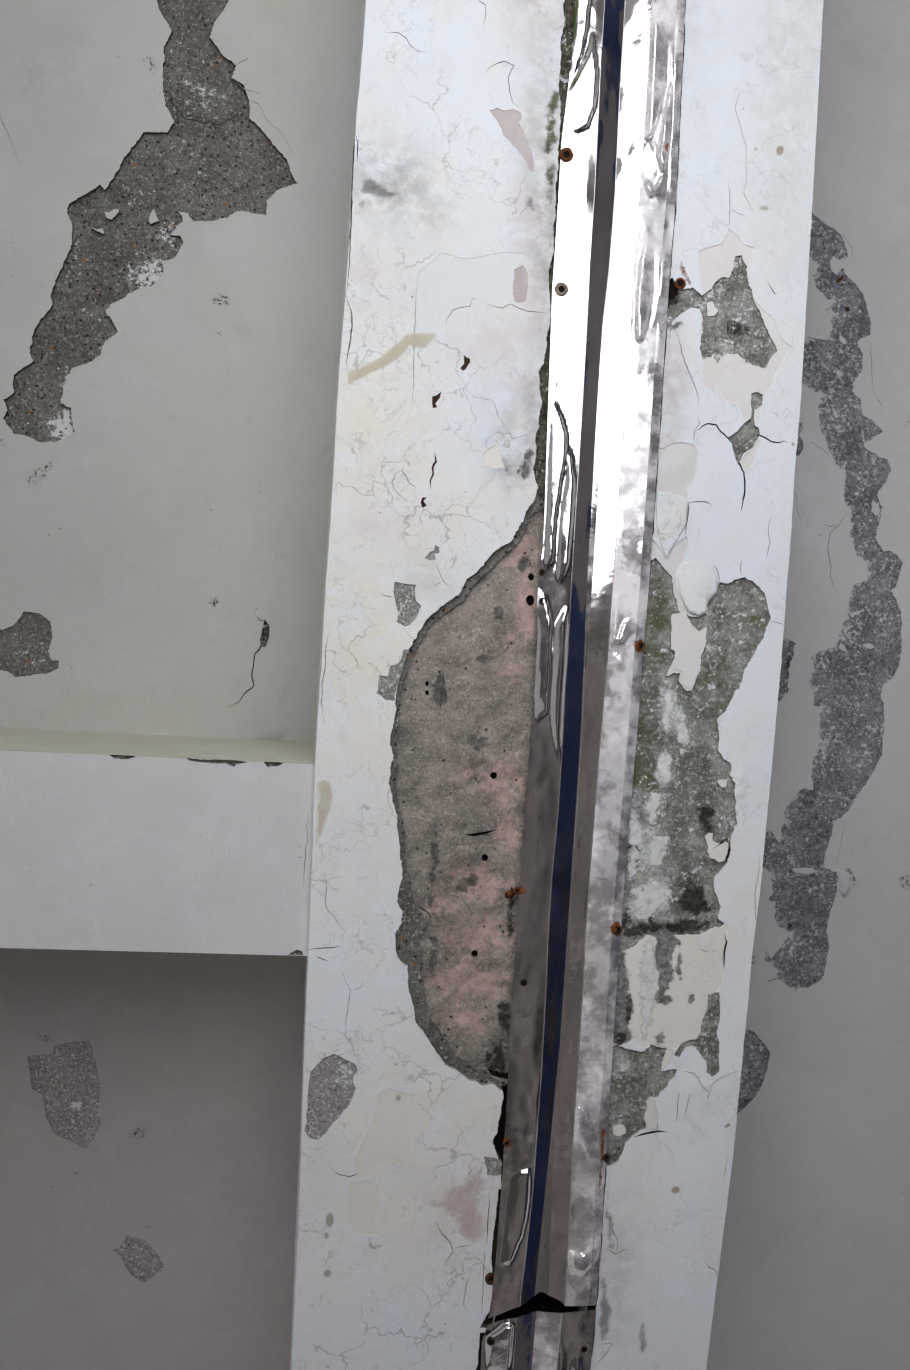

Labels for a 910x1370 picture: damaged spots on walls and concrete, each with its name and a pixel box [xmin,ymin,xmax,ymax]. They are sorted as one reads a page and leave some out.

crack [484,61,518,107]
flaking render [3,0,298,443]
crack [346,127,358,364]
crack [412,285,547,399]
crack [392,456,437,499]
flaking render [376,0,575,1090]
flaking render [0,611,59,677]
flaking render [590,1,903,1366]
crack [299,809,363,1035]
flaking render [27,1041,101,1149]
flaking render [305,1054,357,1140]
crack [437,1200,490,1309]